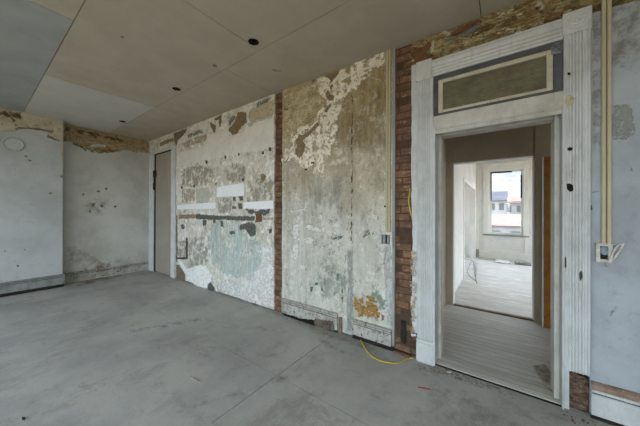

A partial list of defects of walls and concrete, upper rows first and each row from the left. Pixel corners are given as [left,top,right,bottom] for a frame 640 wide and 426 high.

peeling [0,108,149,161]
flaking render [160,115,222,147]
flaking render [612,104,636,140]
peeling [181,160,217,203]
peeling [218,52,385,312]
peeling [176,215,215,291]